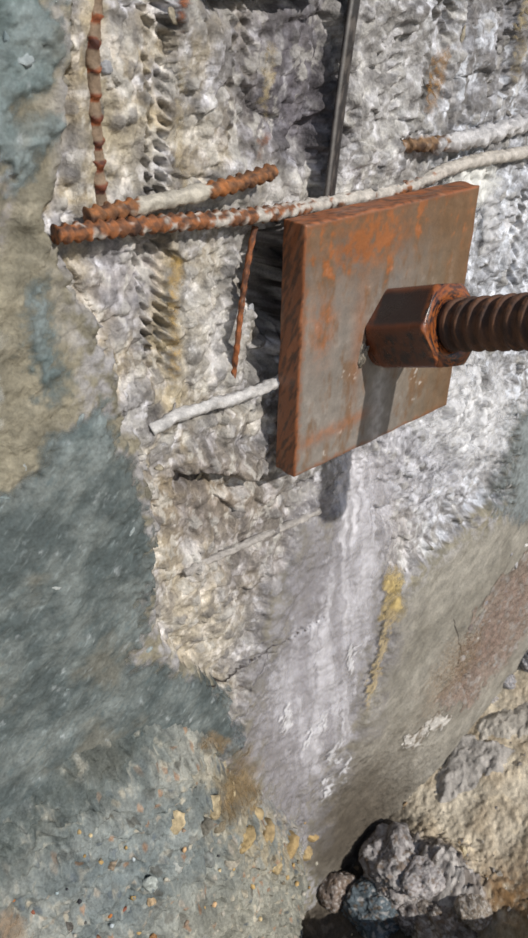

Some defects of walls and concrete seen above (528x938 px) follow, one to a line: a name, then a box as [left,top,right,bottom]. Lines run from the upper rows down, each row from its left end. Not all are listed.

spalling [0,0,528,297]
spalling [0,220,528,828]